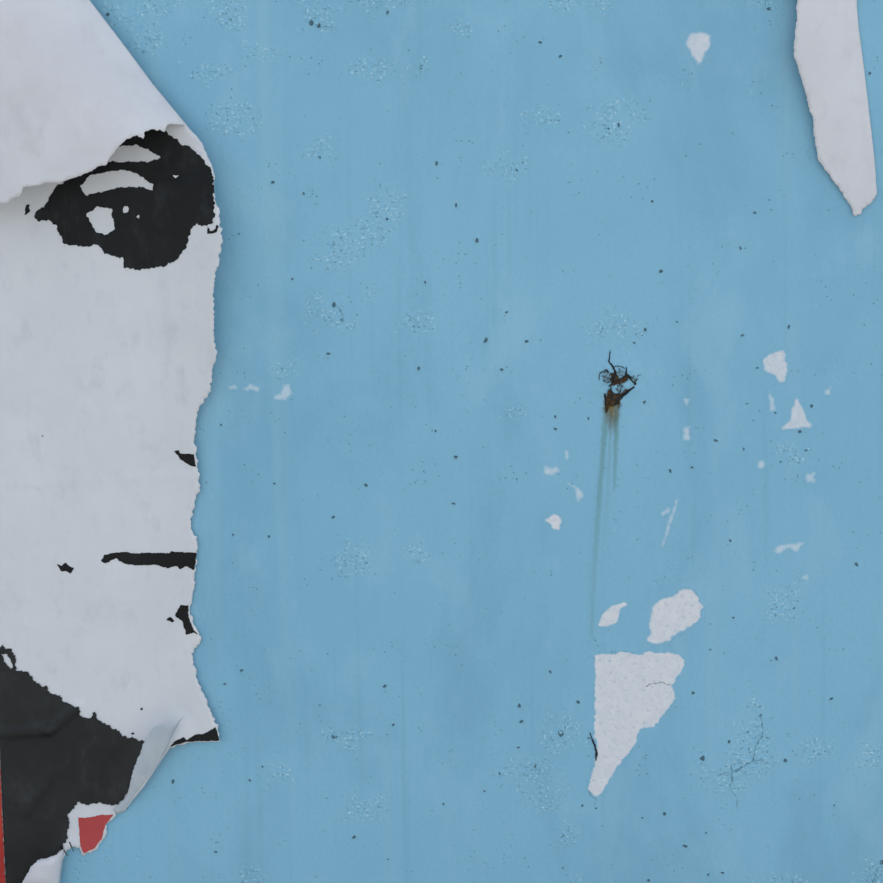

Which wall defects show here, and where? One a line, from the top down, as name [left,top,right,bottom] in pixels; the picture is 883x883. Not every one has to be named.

peeling [683,29,713,67]
peeling [755,348,790,385]
peeling [779,395,816,435]
spalling [580,584,707,810]